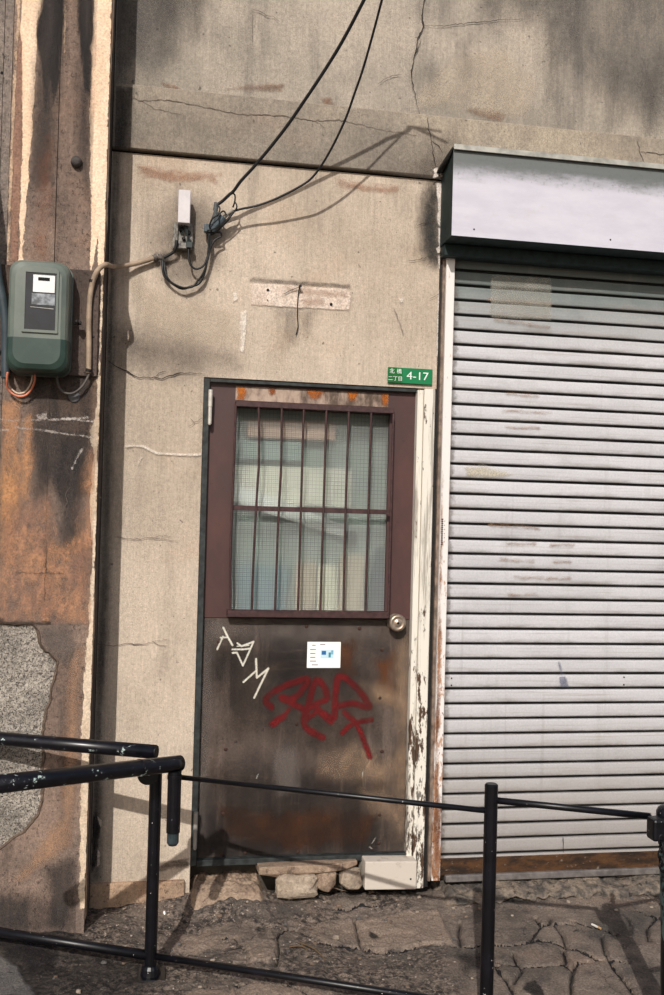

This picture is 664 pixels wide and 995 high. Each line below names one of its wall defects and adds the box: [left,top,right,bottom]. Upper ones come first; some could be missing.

leakage [34,0,64,182]
leakage [78,0,93,176]
crack [124,0,519,167]
crack [109,361,202,379]
corrosion [0,402,91,621]
flaking render [0,622,59,735]
flaking render [0,746,46,774]
flaking render [0,788,45,850]
crack [317,903,633,995]
crack [637,911,661,940]